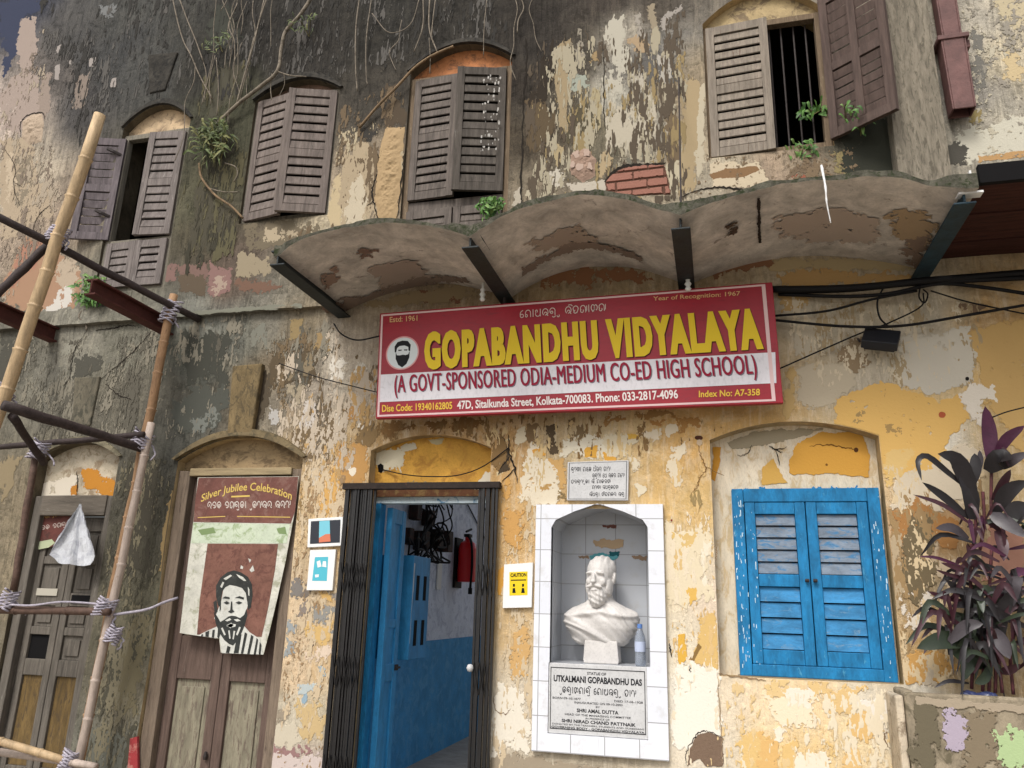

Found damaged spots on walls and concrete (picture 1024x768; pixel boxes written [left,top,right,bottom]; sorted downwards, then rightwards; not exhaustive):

damp [0,0,54,78]
peeling [18,335,100,439]
flaking render [41,457,173,767]
crack [64,324,153,400]
flaking render [0,0,409,300]
damp [58,0,356,298]
peeling [90,123,417,768]
damp [521,223,643,276]
peeling [512,3,769,206]
flaking render [478,415,892,768]
crack [694,445,724,491]
peeling [734,267,1024,686]